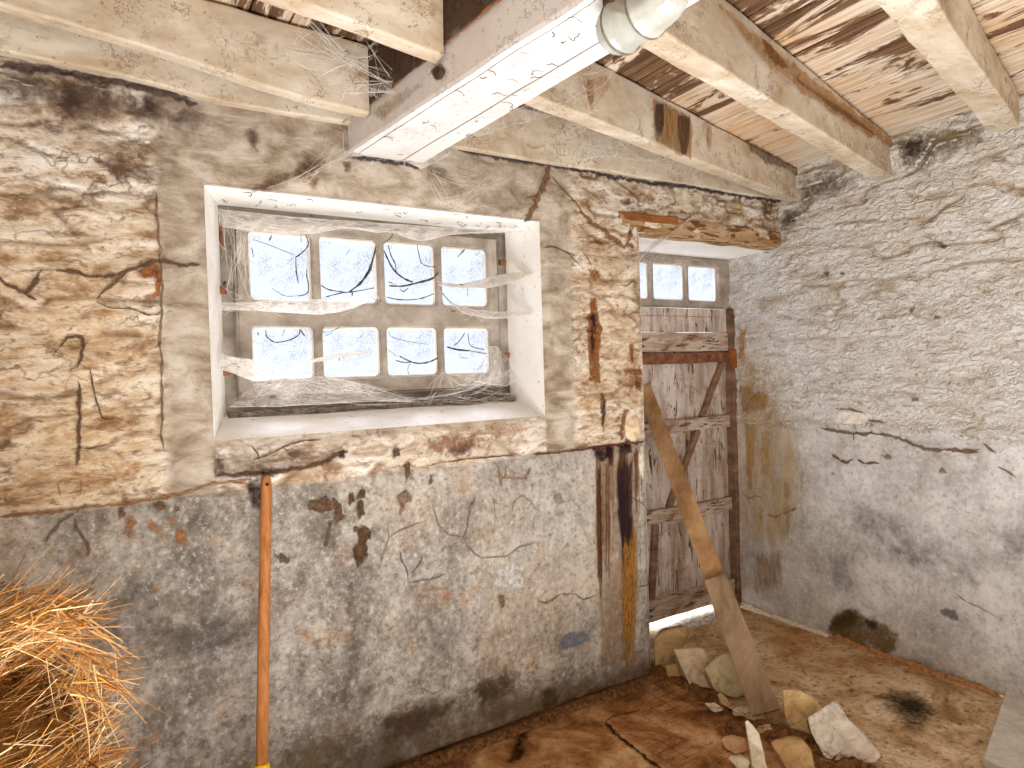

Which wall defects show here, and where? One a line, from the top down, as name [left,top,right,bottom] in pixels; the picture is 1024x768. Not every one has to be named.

damp [5,78,160,119]
damp [106,141,151,180]
crack [458,150,781,249]
damp [900,128,980,166]
crack [0,193,200,450]
rust [586,298,606,426]
crack [0,335,348,556]
crack [821,408,1017,479]
spalling [308,490,371,568]
crack [379,441,644,583]
crack [539,594,594,604]